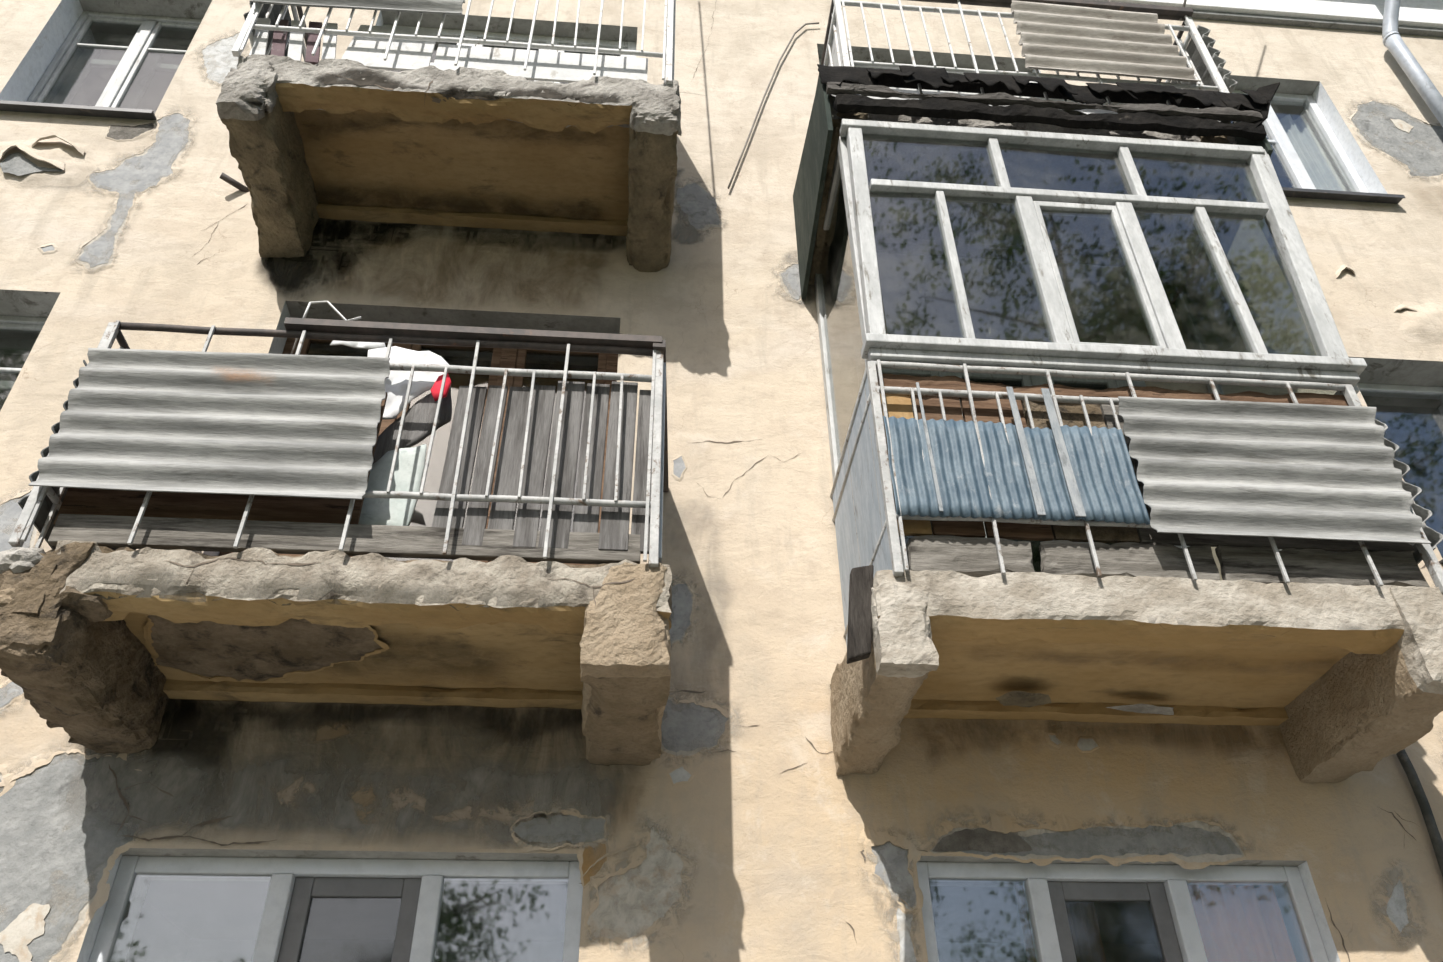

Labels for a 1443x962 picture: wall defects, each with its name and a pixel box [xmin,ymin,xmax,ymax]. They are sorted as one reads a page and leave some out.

spalling [0,135,85,176]
flaking render [73,110,197,274]
leakage [261,191,624,294]
flaking render [1345,99,1443,182]
crack [694,439,797,499]
spalling [0,486,113,622]
flaking render [0,679,27,714]
leakage [73,699,619,844]
flaking render [661,692,738,761]
flaking render [0,745,144,962]
flaking render [510,803,690,951]
spalling [857,809,1247,962]